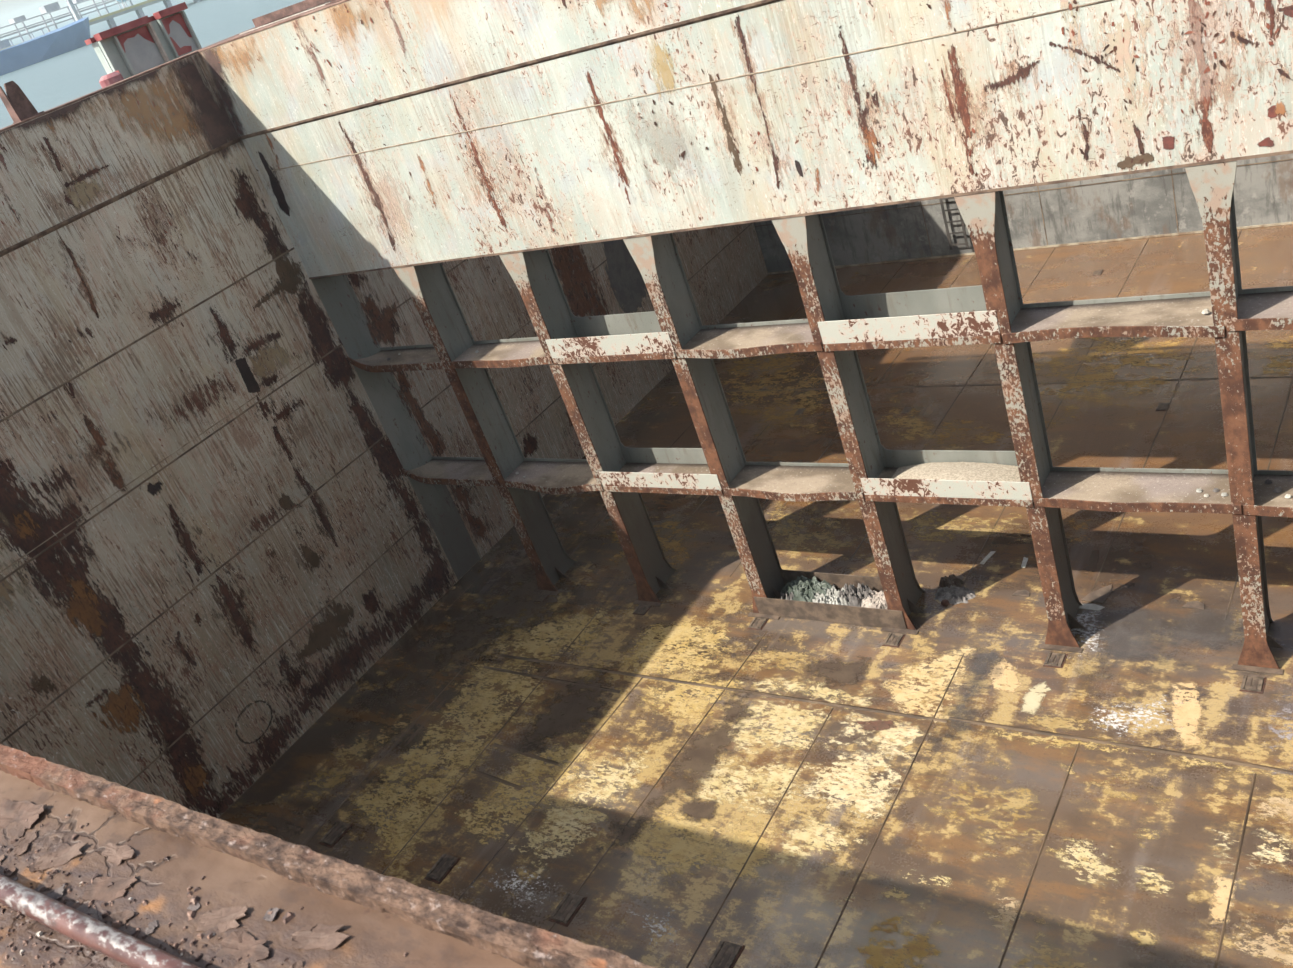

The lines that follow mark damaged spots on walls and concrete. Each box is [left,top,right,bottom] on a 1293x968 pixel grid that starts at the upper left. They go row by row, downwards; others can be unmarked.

corrosion [586,68,631,205]
corrosion [701,69,742,176]
corrosion [734,16,780,189]
corrosion [838,26,882,169]
corrosion [926,1,977,180]
corrosion [1117,118,1154,170]
corrosion [1181,0,1226,153]
corrosion [535,167,610,317]
corrosion [0,38,453,605]
corrosion [0,414,223,816]
damp [1091,696,1183,734]
damp [1269,695,1293,749]